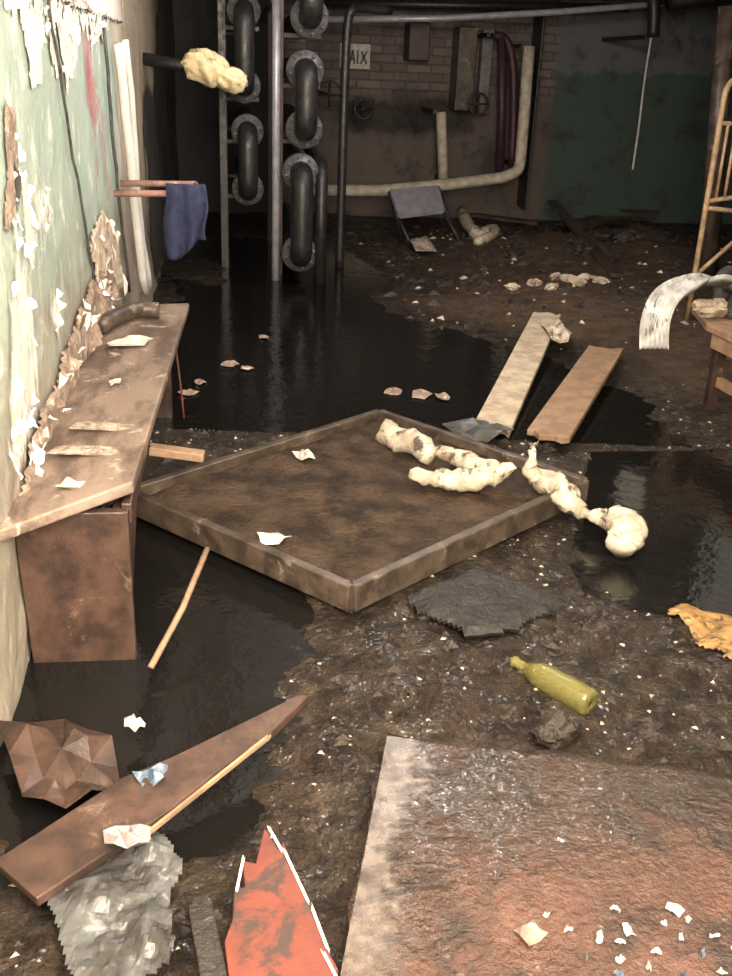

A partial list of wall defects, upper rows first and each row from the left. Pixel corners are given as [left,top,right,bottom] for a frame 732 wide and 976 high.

peeling [4,0,110,94]
spalling [4,100,128,497]